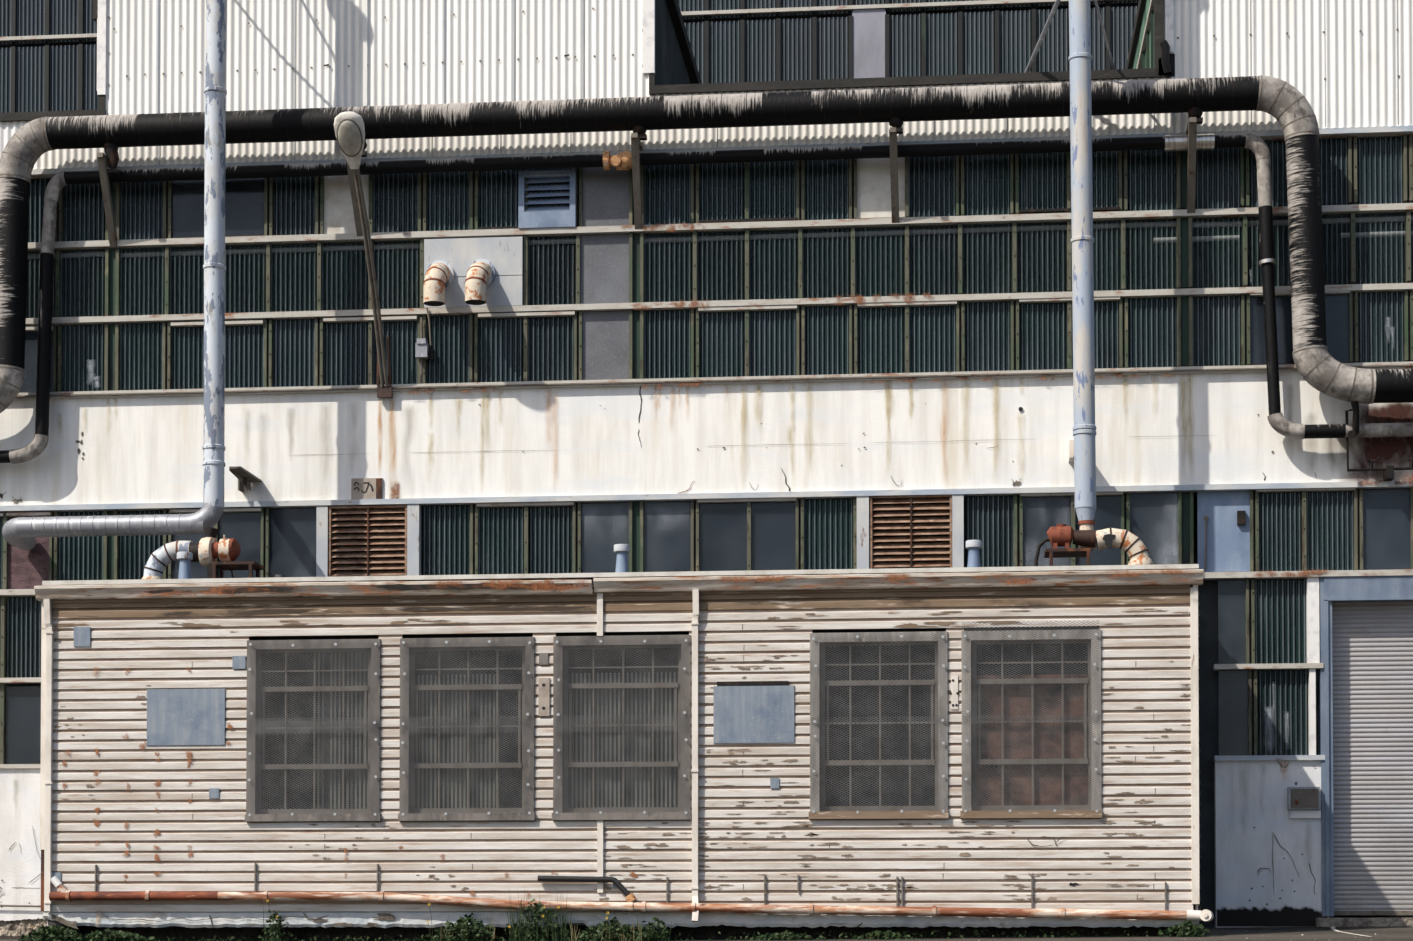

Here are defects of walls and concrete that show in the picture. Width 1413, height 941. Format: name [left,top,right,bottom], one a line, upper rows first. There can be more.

corrosion [1351,403,1413,486]
corrosion [376,478,399,499]
peeling [39,615,94,629]
peeling [162,614,237,632]
peeling [379,609,469,624]
peeling [887,610,1030,628]
peeling [1107,597,1190,625]
peeling [595,749,917,900]
peeling [899,821,1023,847]
peeling [1002,873,1057,900]
spalling [0,902,78,936]
spalling [313,913,395,927]